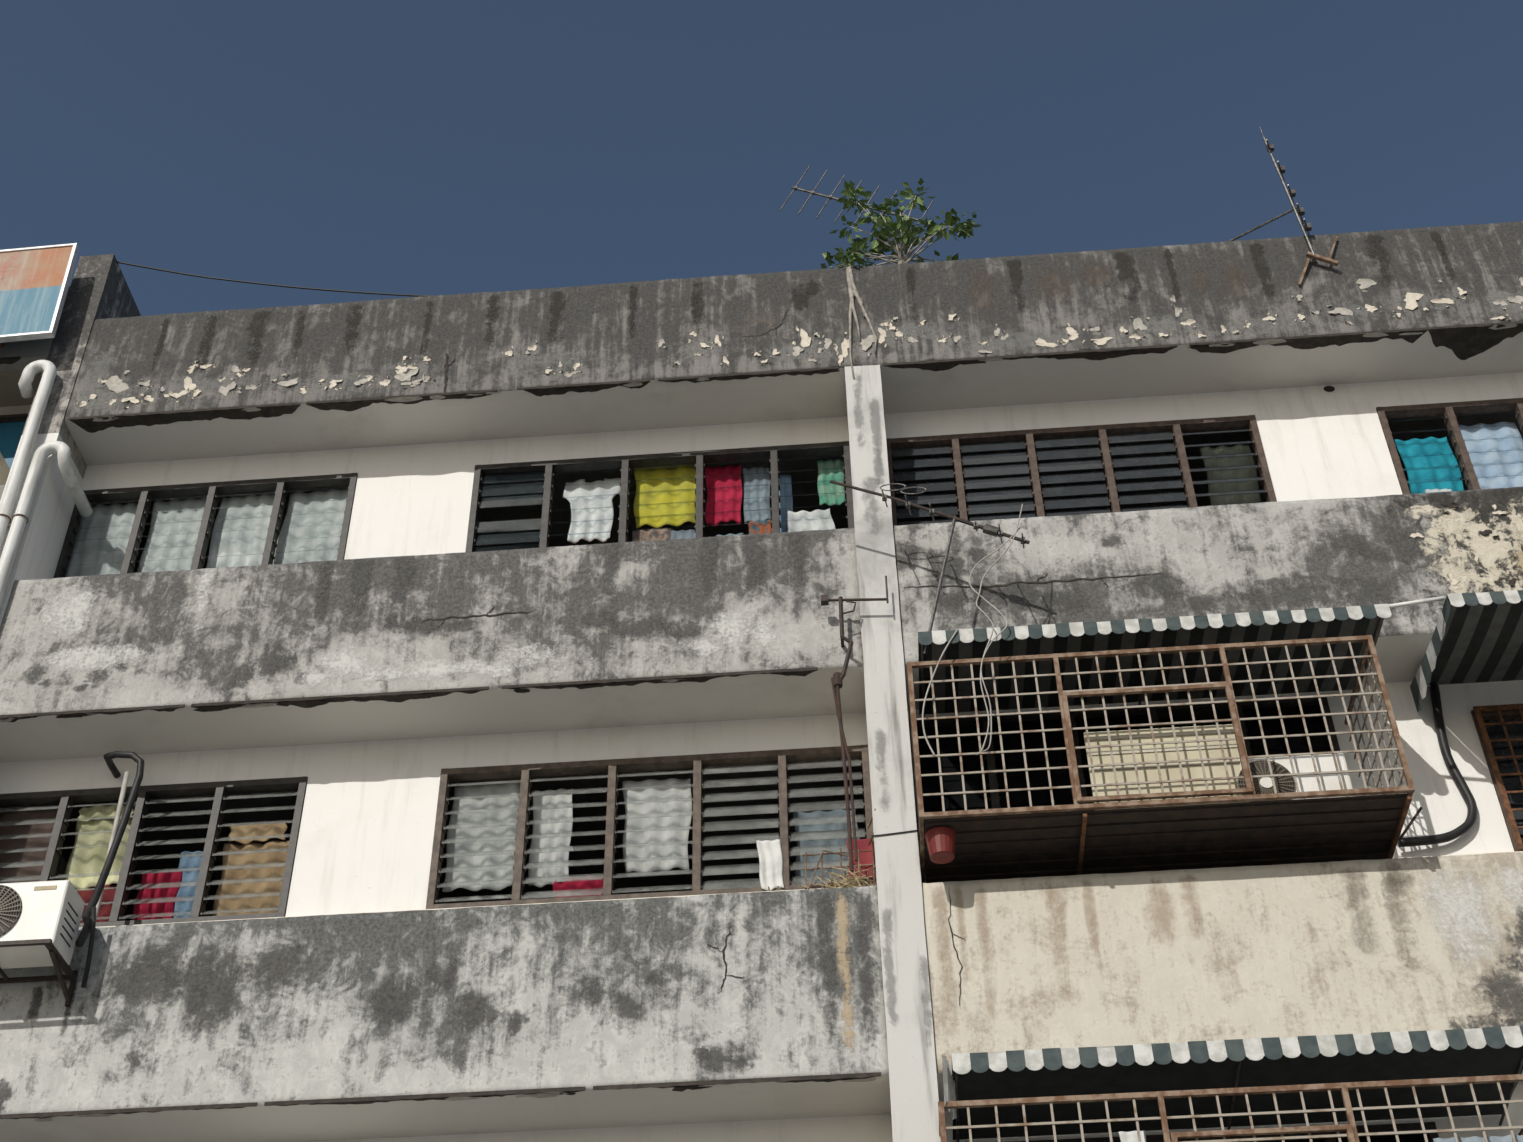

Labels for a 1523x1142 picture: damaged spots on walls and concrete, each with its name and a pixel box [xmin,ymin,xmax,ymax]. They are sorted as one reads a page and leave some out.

spalling [502,277,1523,397]
water stain [23,592,145,692]
water stain [230,640,553,688]
water stain [582,534,775,656]
peeling [1383,487,1523,621]
mould [108,939,309,1033]
water stain [369,962,529,1035]
water stain [693,1042,753,1073]
crack [707,925,743,993]
water stain [817,893,877,1046]
crack [948,887,965,1006]
water stain [1451,911,1523,1029]